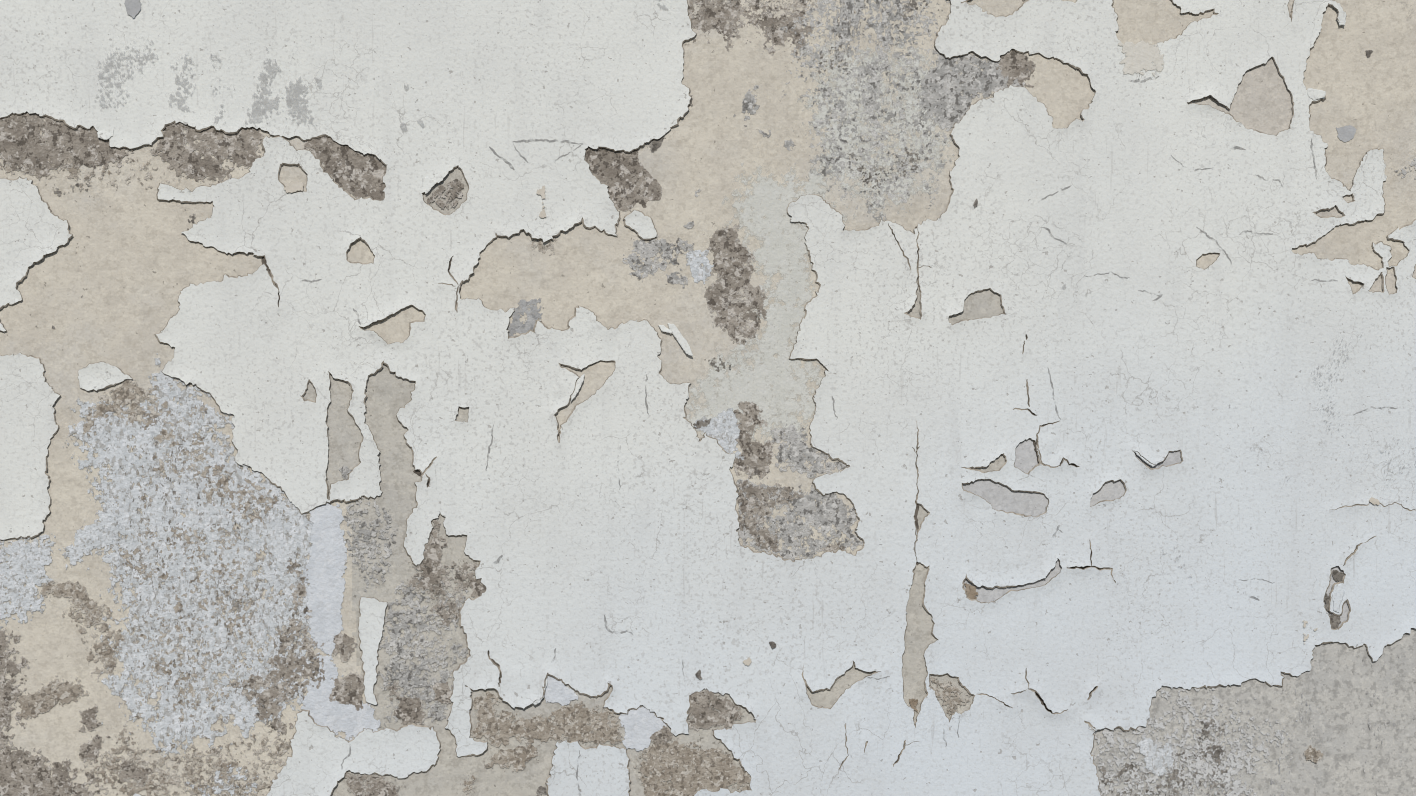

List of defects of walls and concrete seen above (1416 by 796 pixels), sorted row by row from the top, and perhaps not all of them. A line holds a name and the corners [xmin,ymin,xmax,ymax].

peeling [1112,0,1214,45]
peeling [1188,0,1416,294]
peeling [460,0,1095,561]
peeling [0,112,755,796]
peeling [1090,480,1125,506]
peeling [1134,450,1182,469]
peeling [902,563,974,724]
peeling [1091,566,1416,796]